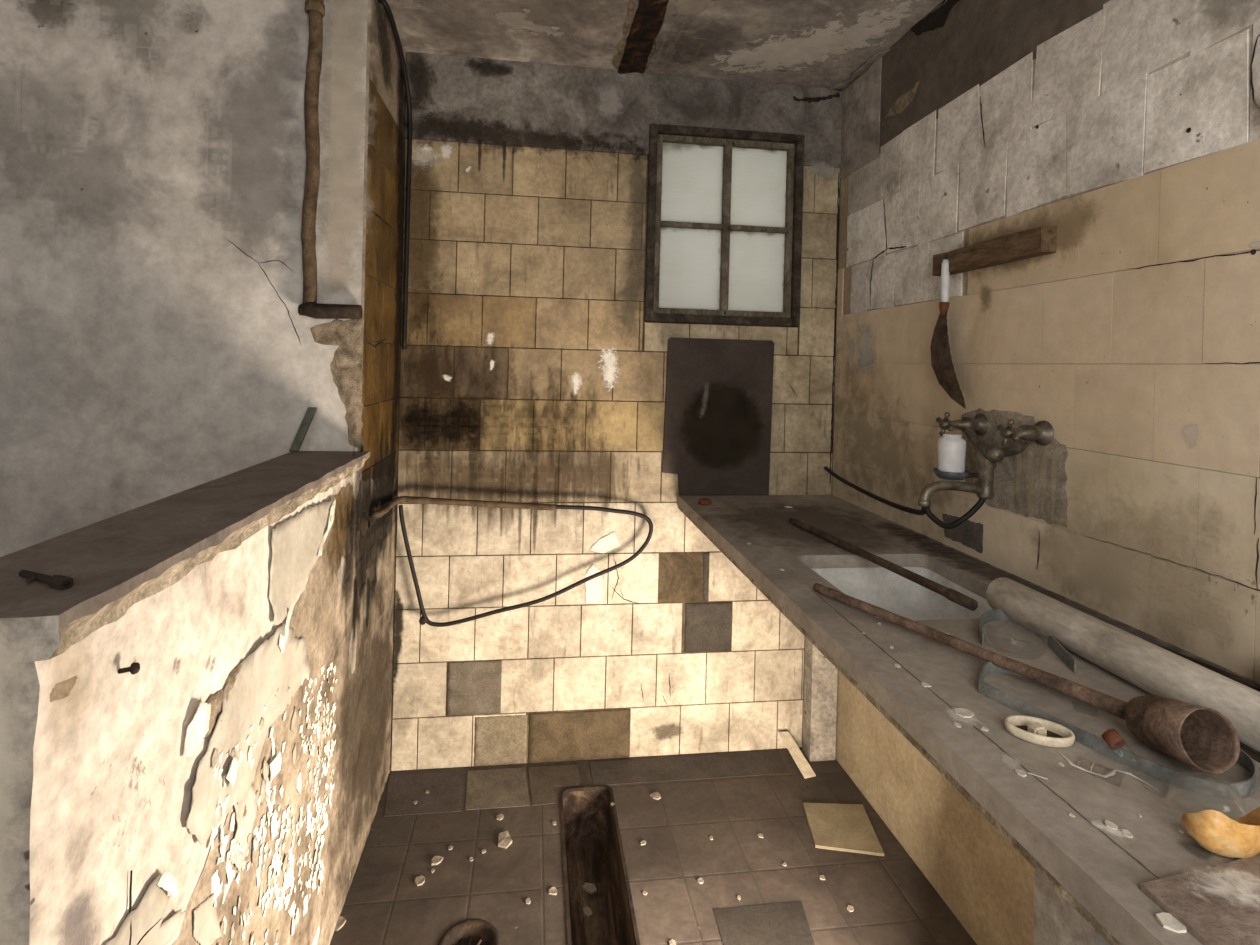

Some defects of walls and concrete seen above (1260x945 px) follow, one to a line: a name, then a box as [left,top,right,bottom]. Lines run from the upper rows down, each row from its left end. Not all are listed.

peeling [698,0,959,103]
crack [226,239,301,344]
crack [1135,250,1260,269]
flaking render [310,317,364,448]
peeling [961,408,1068,528]
crack [1085,479,1260,591]
flaking render [49,676,78,702]
peeling [105,473,397,945]
damp [338,579,394,842]
peeling [447,661,631,766]